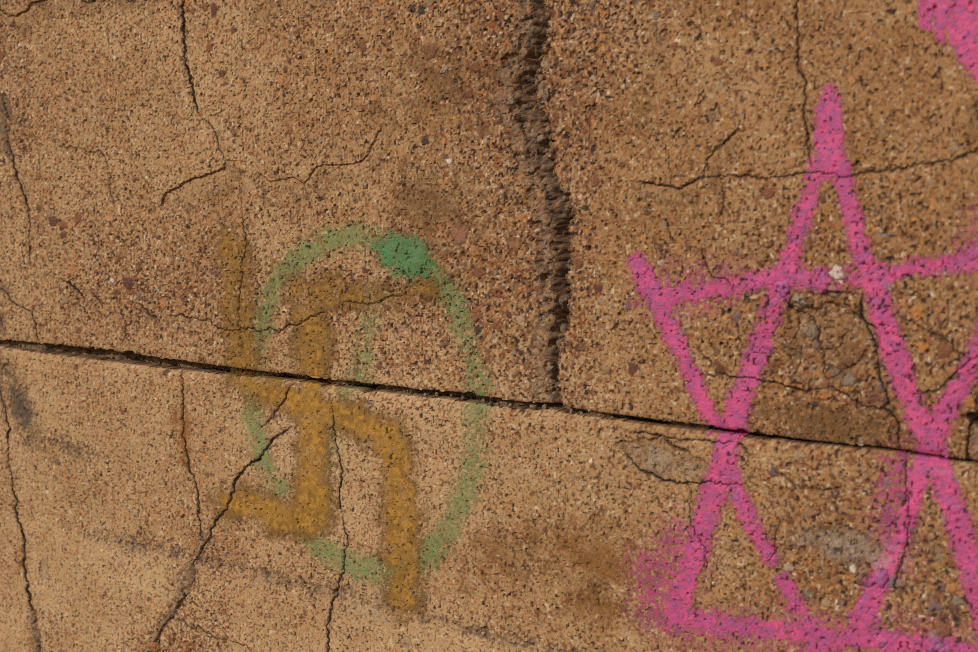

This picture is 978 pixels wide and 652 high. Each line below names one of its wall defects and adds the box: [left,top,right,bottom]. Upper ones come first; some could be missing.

crack [4,119,31,266]
crack [180,0,224,158]
crack [493,0,576,406]
crack [635,0,978,217]
crack [0,356,42,650]
crack [158,609,251,651]
crack [180,373,293,579]
crack [326,414,349,652]
crack [718,291,911,595]
crack [899,316,978,395]